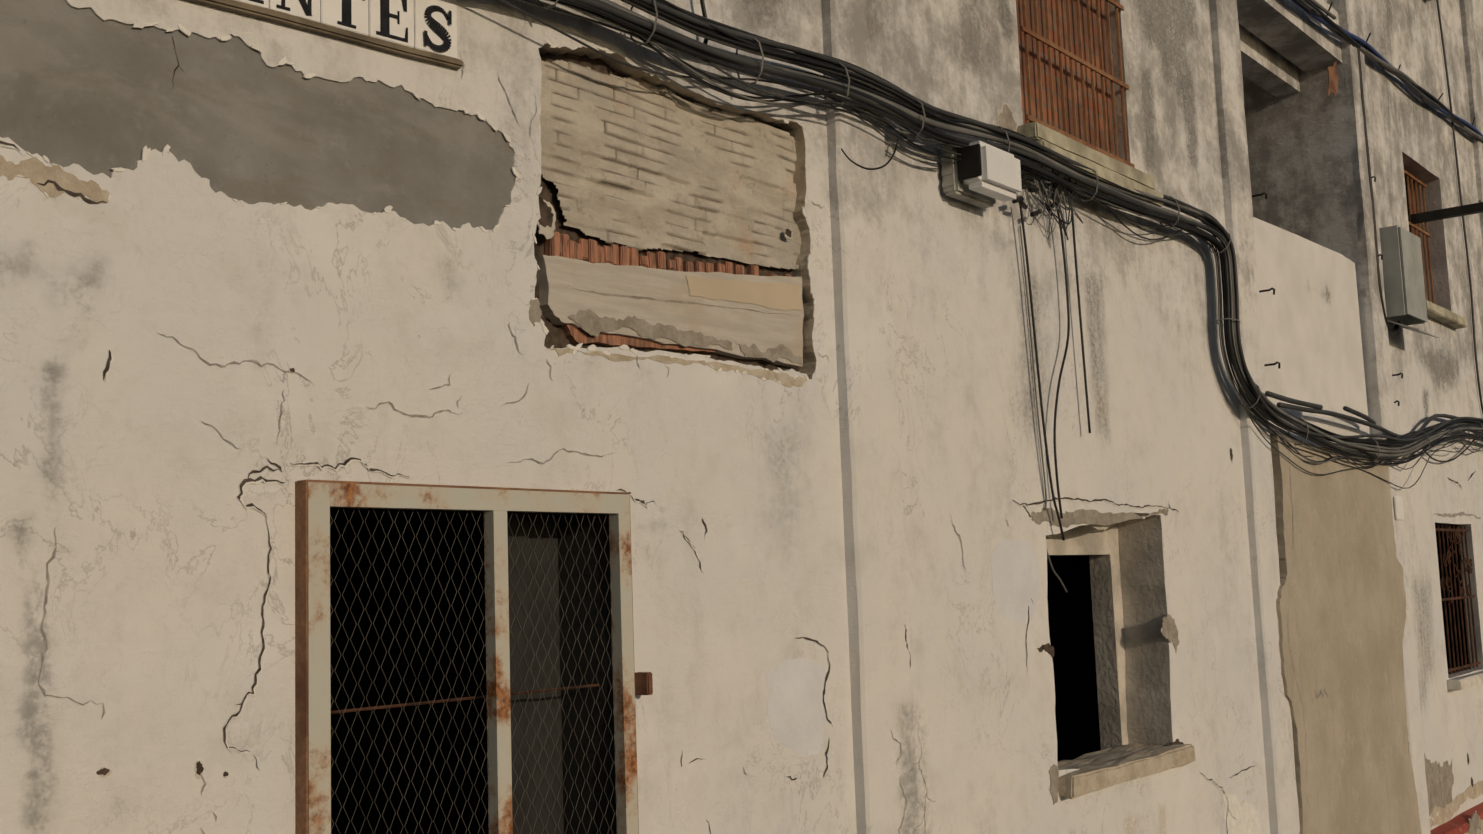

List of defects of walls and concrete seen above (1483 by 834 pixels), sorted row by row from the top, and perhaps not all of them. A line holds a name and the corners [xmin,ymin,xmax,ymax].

peeling [0,0,520,233]
spalling [529,41,817,388]
crack [103,350,114,383]
crack [159,333,410,769]
spalling [1031,507,1168,528]
peeling [1424,753,1483,834]